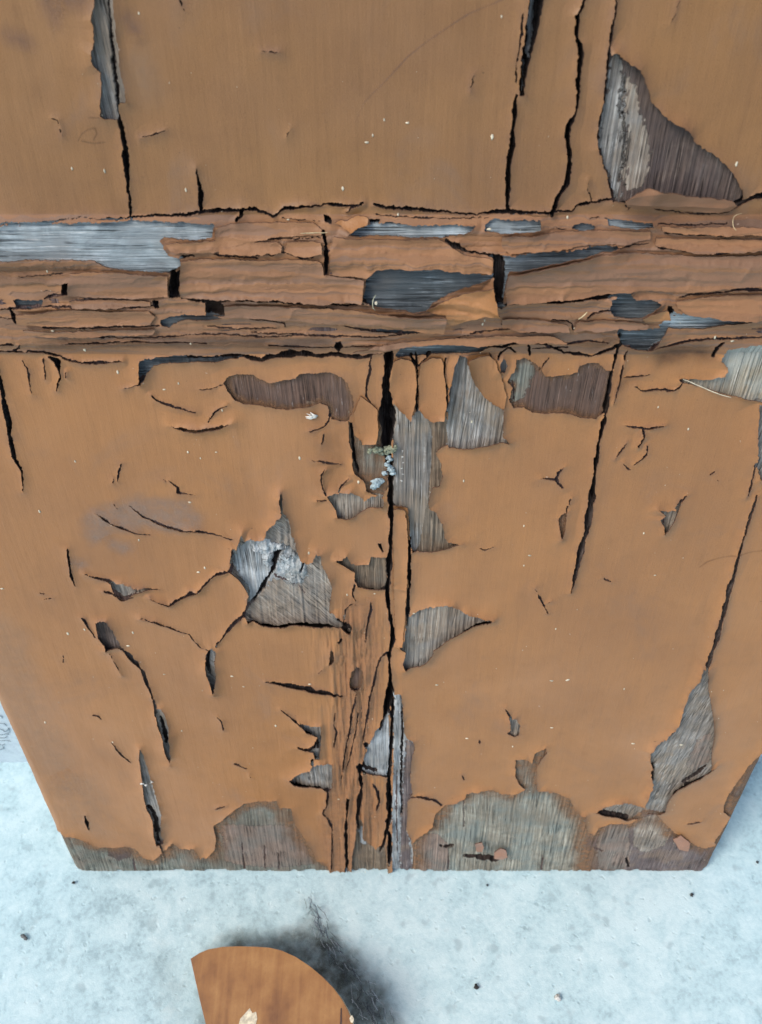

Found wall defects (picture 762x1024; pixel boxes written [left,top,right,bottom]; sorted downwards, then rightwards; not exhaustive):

peeling [91,0,126,120]
crack [0,0,762,592]
peeling [0,52,762,694]
crack [706,495,757,668]
peeling [82,618,171,762]
peeling [61,666,364,871]
peeling [351,667,760,871]